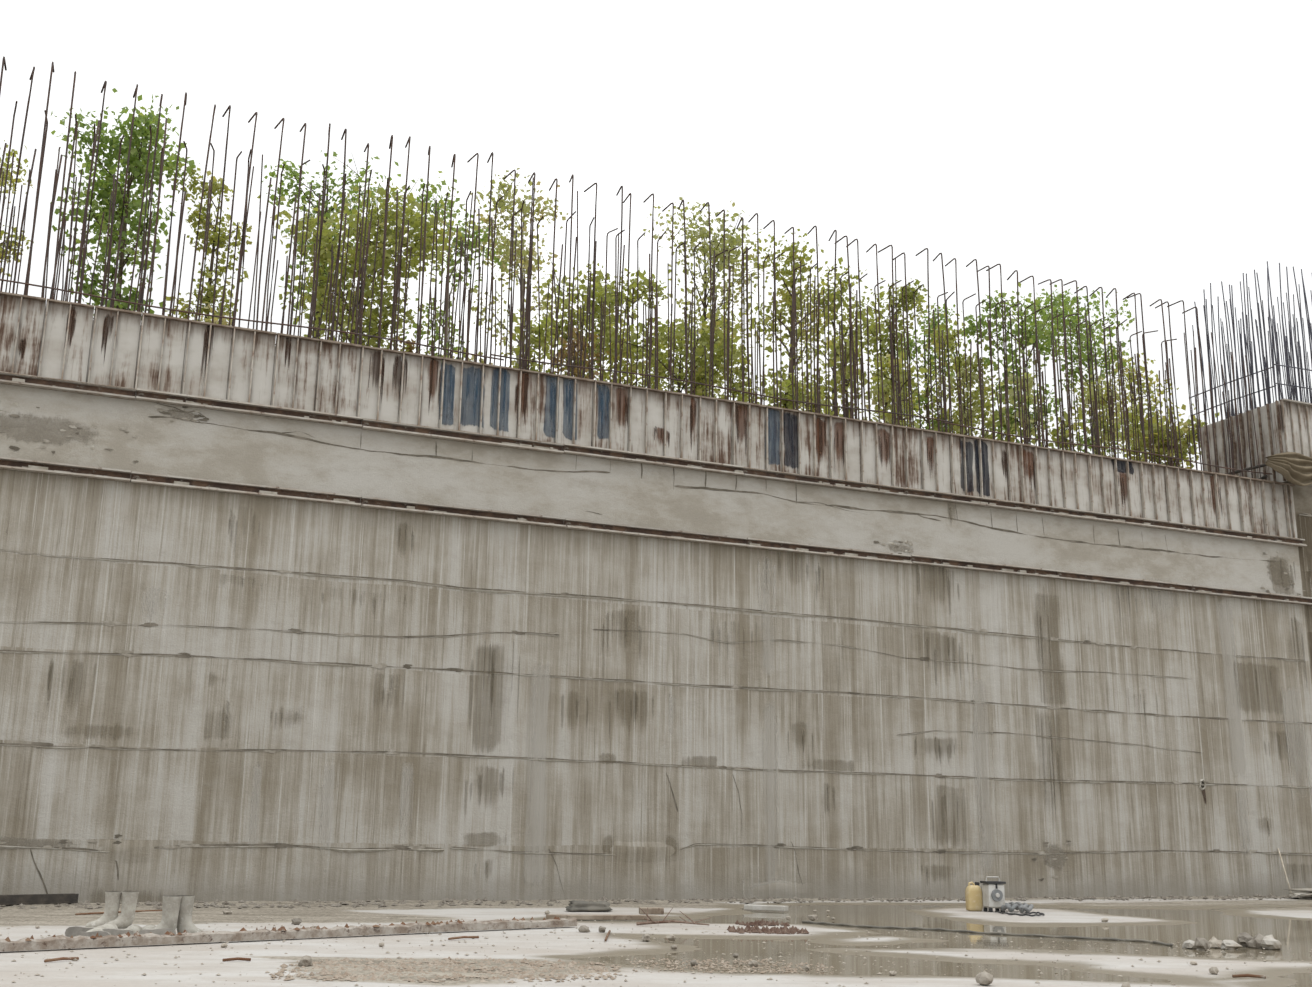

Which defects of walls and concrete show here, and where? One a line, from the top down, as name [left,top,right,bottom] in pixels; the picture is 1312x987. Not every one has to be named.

corrosion [65,307,76,345]
corrosion [102,315,114,359]
corrosion [201,322,214,372]
corrosion [368,351,408,394]
corrosion [429,359,441,406]
corrosion [515,372,529,419]
corrosion [815,418,847,463]
crack [0,549,1305,679]
crack [0,621,1312,812]
crack [0,841,119,894]
crack [154,843,611,896]
crack [680,842,1312,885]